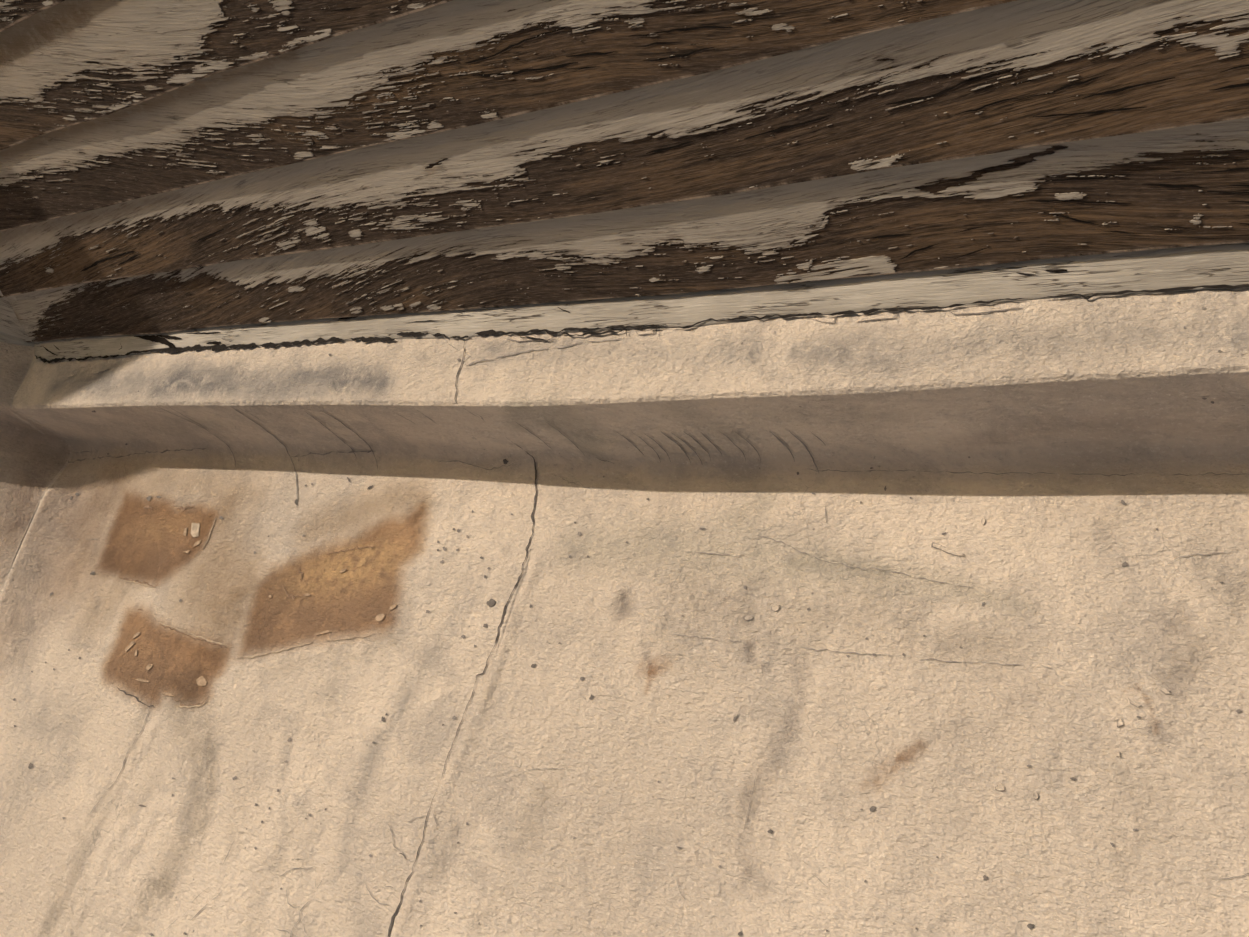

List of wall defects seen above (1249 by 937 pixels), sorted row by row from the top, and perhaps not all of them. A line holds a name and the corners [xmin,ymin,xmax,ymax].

peeling [0,0,1249,342]
crack [1037,168,1249,234]
spalling [182,516,224,553]
crack [35,227,1249,937]